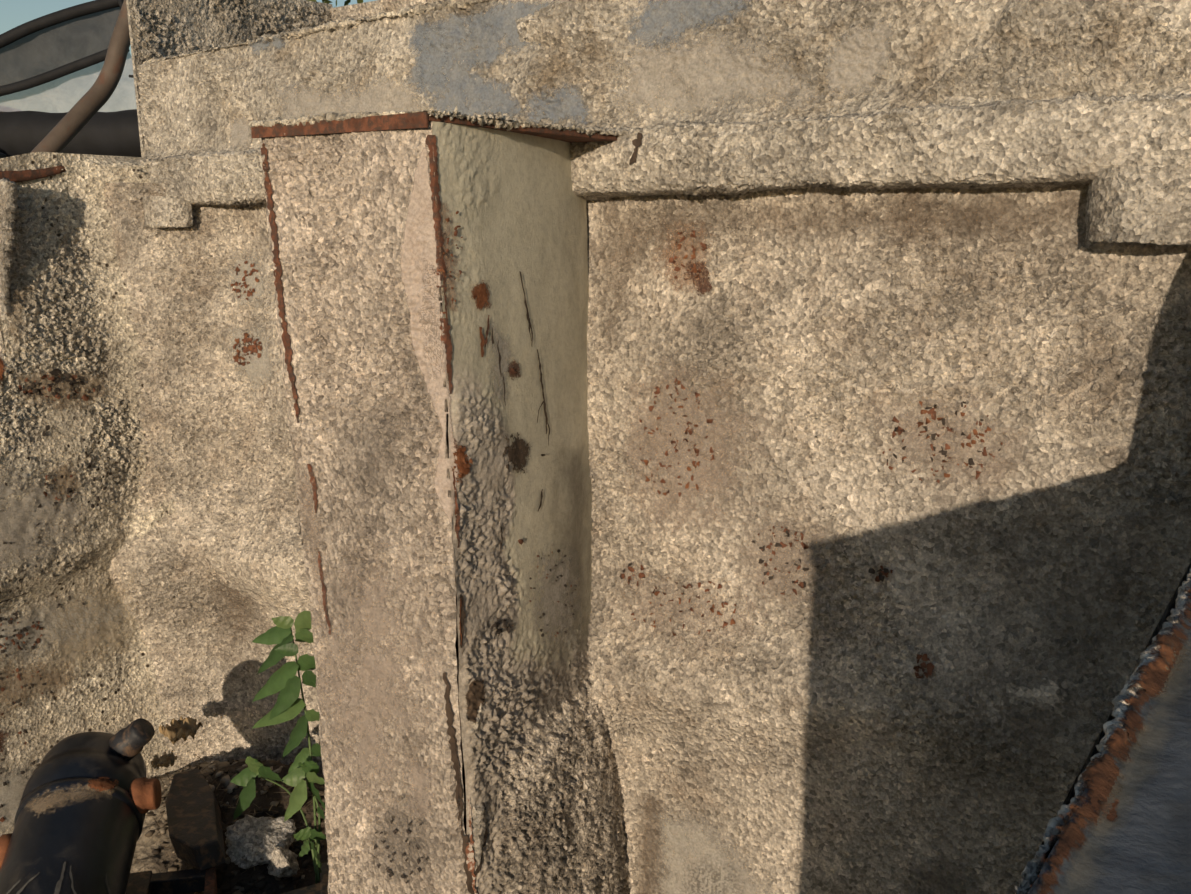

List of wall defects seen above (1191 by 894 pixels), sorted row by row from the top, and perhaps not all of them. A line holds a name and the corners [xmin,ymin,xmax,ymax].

rust [227,143,300,423]
rust [425,135,463,394]
rust [471,282,490,357]
rust [659,223,712,296]
rust [507,359,521,380]
rust [307,464,317,513]
rust [318,551,331,635]
crack [458,595,466,648]
rust [0,659,73,756]
rust [913,653,934,678]
rust [1030,585,1191,894]
crack [440,673,489,894]